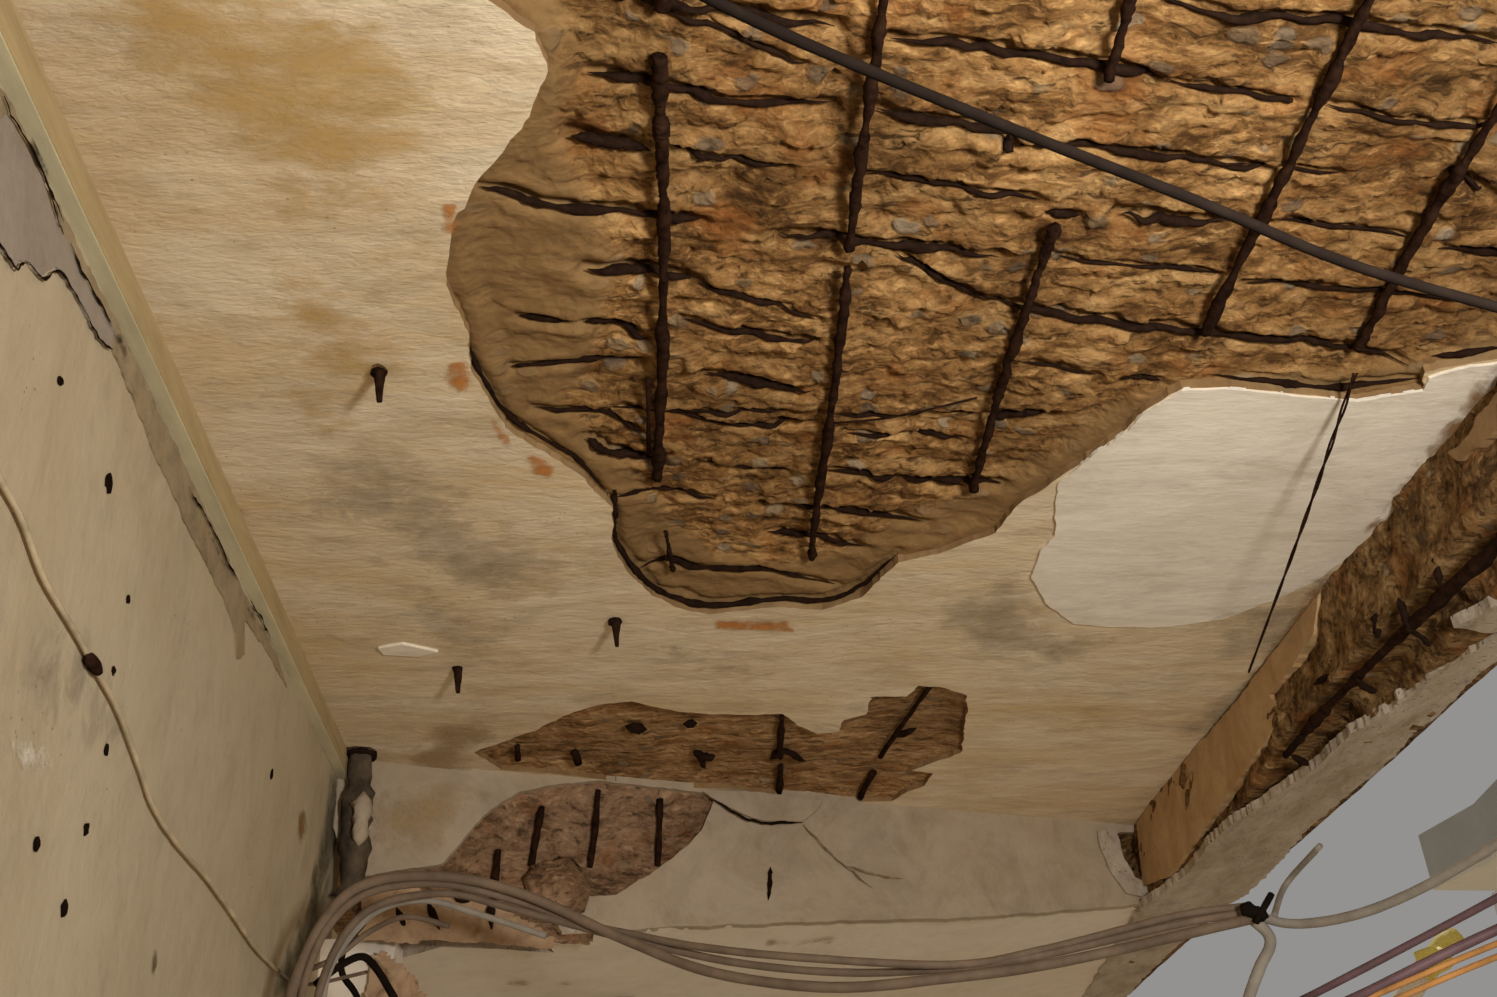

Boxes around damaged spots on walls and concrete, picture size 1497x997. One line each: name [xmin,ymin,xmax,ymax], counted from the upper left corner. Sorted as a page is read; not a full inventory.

peeling [0,88,287,688]
spalling [445,0,1497,632]
spalling [1282,533,1497,766]
spalling [351,686,967,997]
crack [766,867,774,900]
crack [711,797,902,887]